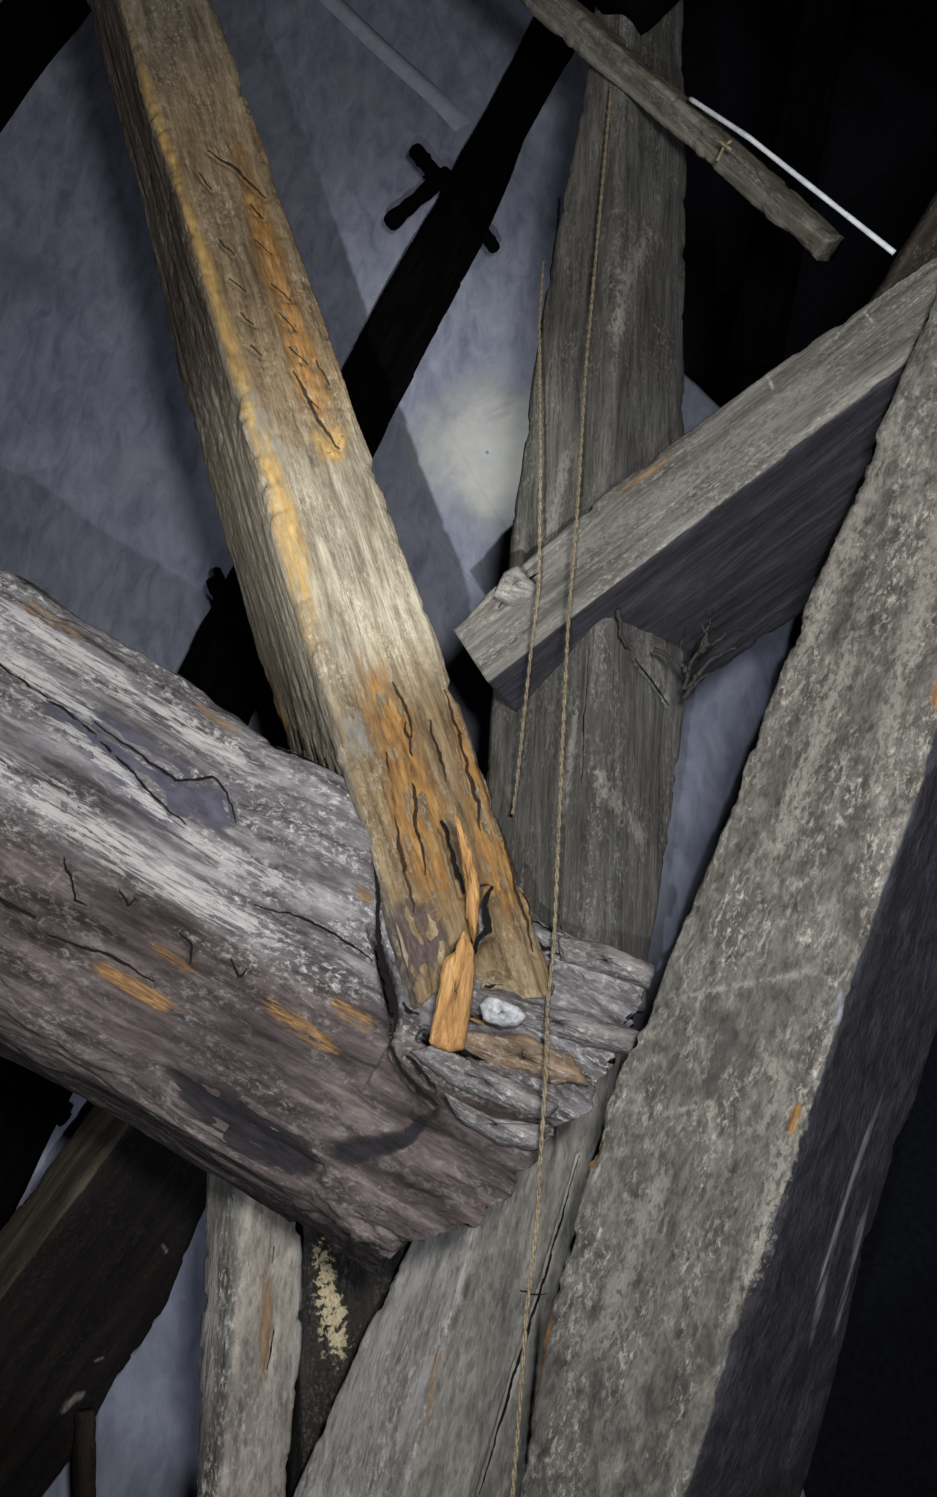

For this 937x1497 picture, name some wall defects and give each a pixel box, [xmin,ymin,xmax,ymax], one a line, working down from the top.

crack [635,658,669,705]
crack [581,649,590,783]
crack [64,857,136,906]
crack [253,681,560,1106]
crack [0,897,154,982]
crack [179,932,193,964]
crack [231,958,247,977]